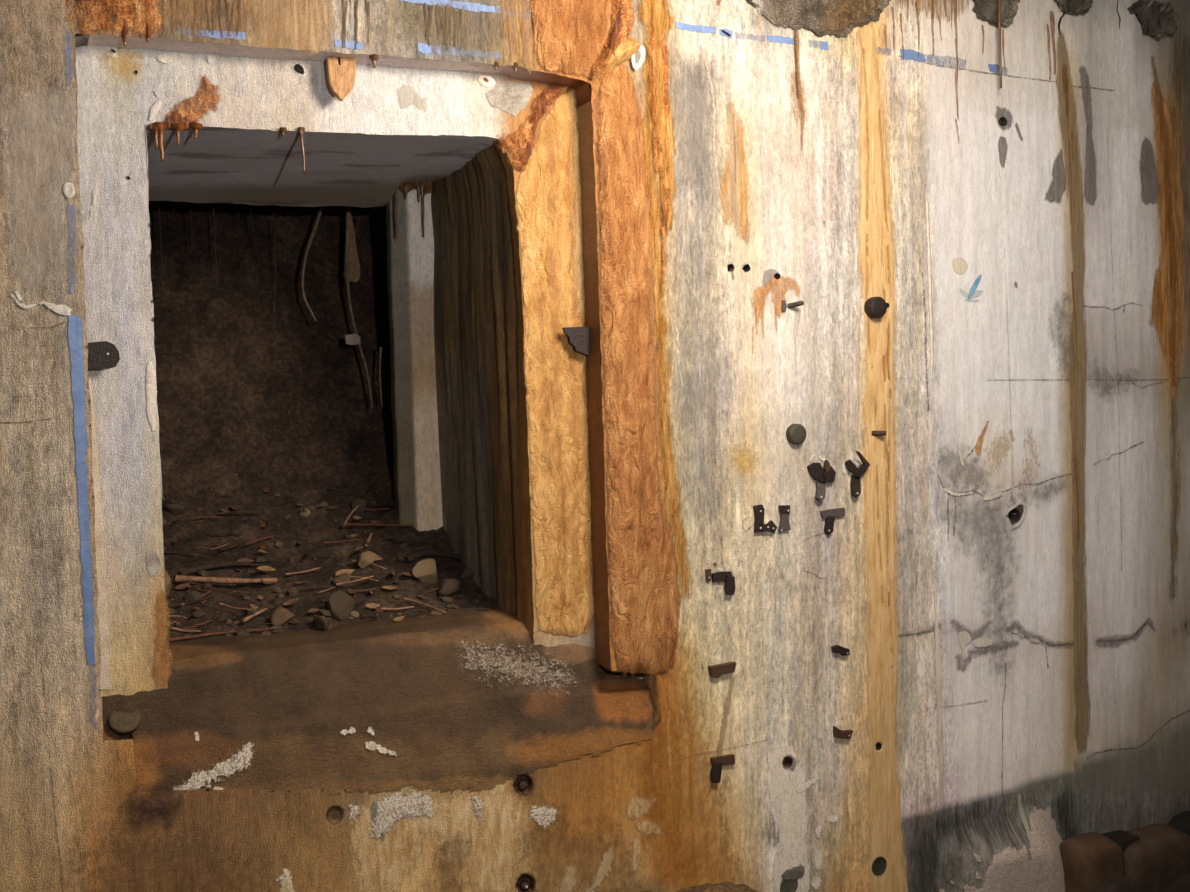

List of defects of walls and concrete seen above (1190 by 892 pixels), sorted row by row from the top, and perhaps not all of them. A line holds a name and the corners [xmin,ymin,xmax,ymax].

rust [66,0,254,42]
spalling [747,0,891,38]
spalling [974,0,1020,28]
spalling [1056,0,1093,16]
spalling [1129,0,1180,41]
rust [150,76,220,130]
rust [499,0,693,675]
rust [752,276,800,354]
rust [1150,57,1183,598]
leakage [856,22,1023,892]
crack [898,618,1153,796]